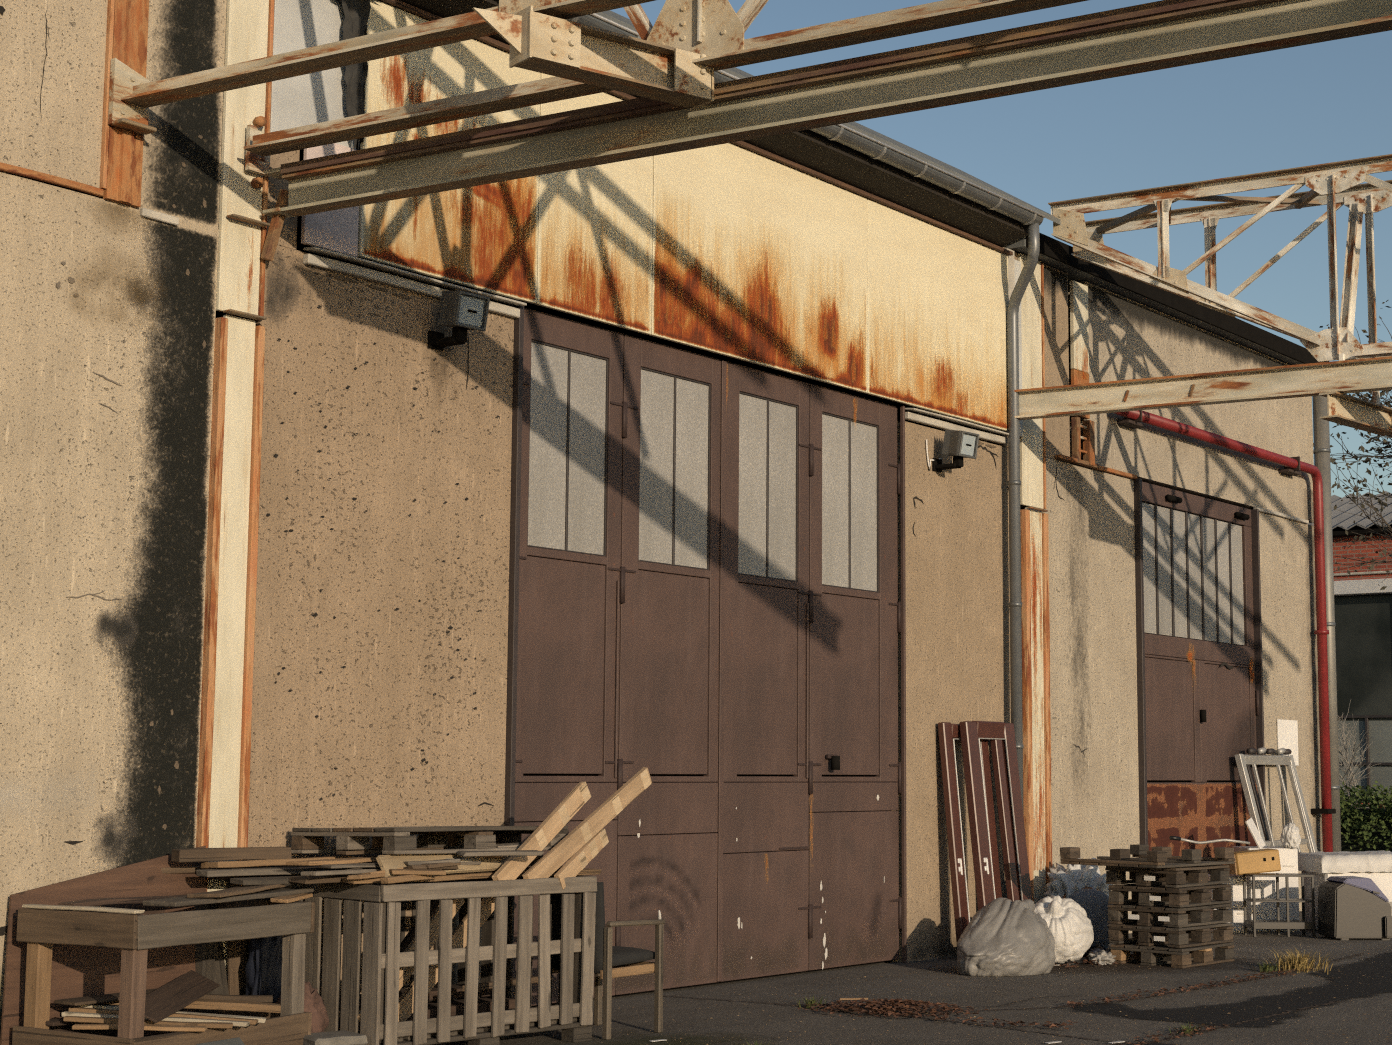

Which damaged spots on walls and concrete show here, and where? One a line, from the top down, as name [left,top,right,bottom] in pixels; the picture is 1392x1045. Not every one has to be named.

corrosion [364,176,1008,429]
corrosion [1031,536,1043,716]
corrosion [1033,766,1045,870]